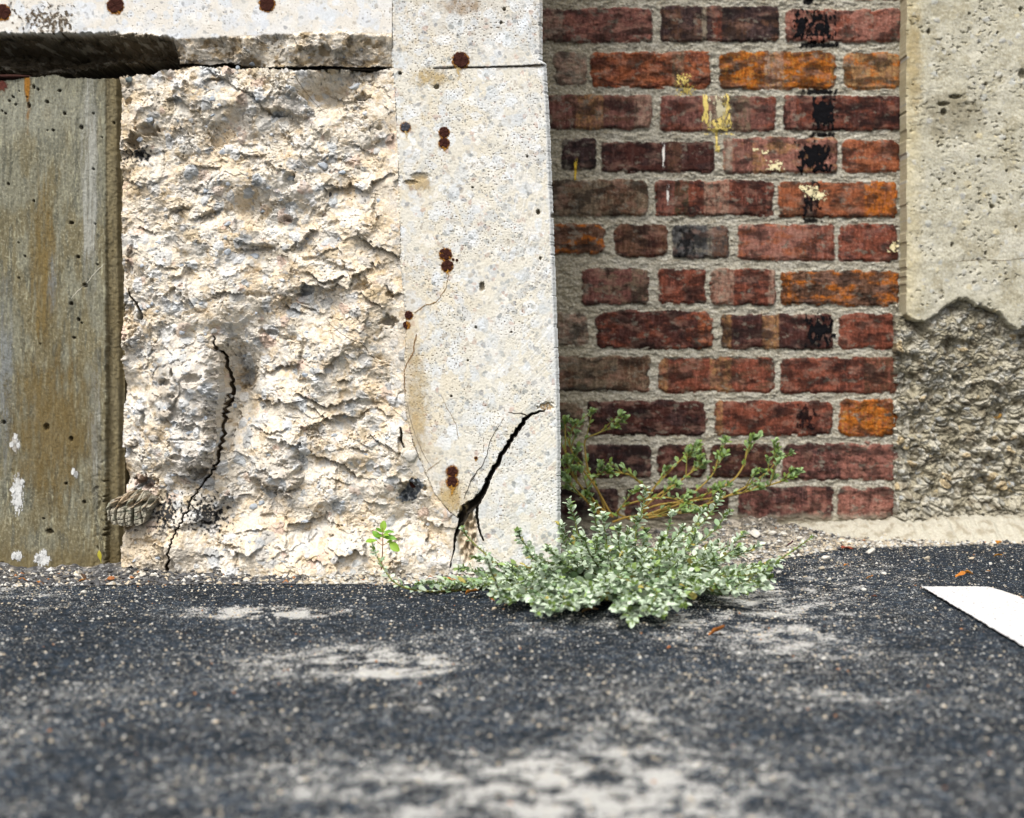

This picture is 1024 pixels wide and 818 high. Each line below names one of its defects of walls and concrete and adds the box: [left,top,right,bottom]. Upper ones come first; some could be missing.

corrosion [106,0,124,15]
corrosion [258,0,276,13]
corrosion [451,52,470,75]
crack [179,63,389,114]
corrosion [438,127,450,151]
corrosion [439,248,458,276]
corrosion [403,311,413,342]
spalling [891,300,1024,522]
crack [165,336,236,571]
corrosion [446,465,459,495]
crack [450,409,545,565]